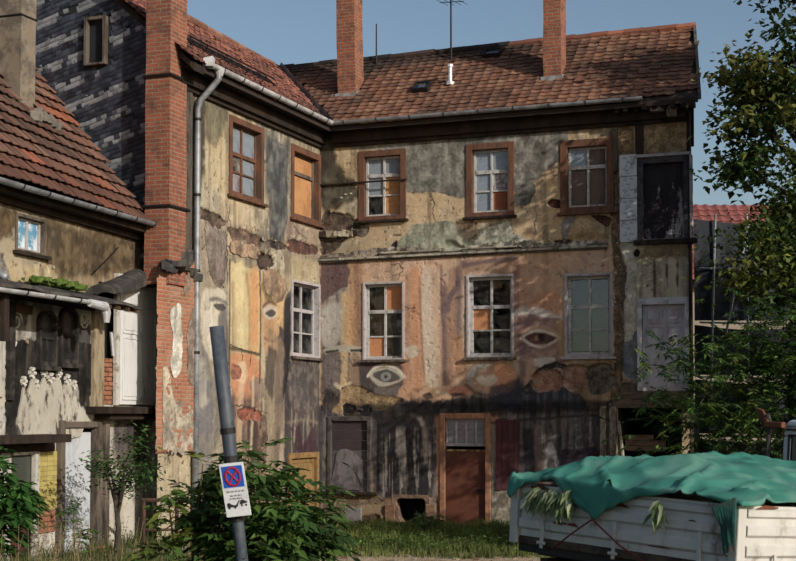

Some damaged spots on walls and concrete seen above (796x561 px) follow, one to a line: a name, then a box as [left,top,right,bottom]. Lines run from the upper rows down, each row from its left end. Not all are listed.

peeling [340,131,569,206]
spalling [644,123,686,154]
peeling [200,192,601,270]
spalling [521,126,649,406]
flaking render [155,260,195,456]
flaking render [231,365,242,380]
water stain [349,401,612,417]
water stain [403,445,417,492]